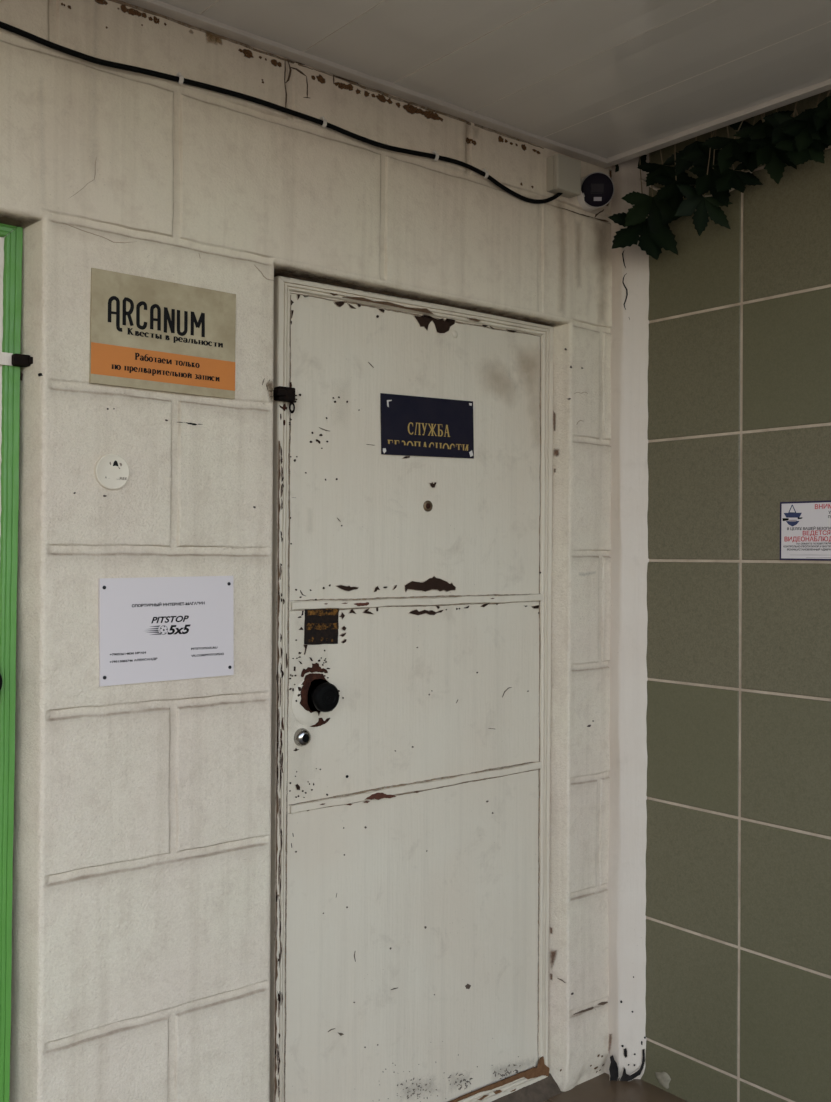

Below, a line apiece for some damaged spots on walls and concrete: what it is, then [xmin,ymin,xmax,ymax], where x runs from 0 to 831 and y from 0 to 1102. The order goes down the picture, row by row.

peeling [330,293,493,334]
peeling [295,575,456,644]
peeling [409,598,498,615]
corrosion [262,290,565,1102]
peeling [273,441,330,1102]
peeling [347,793,397,805]